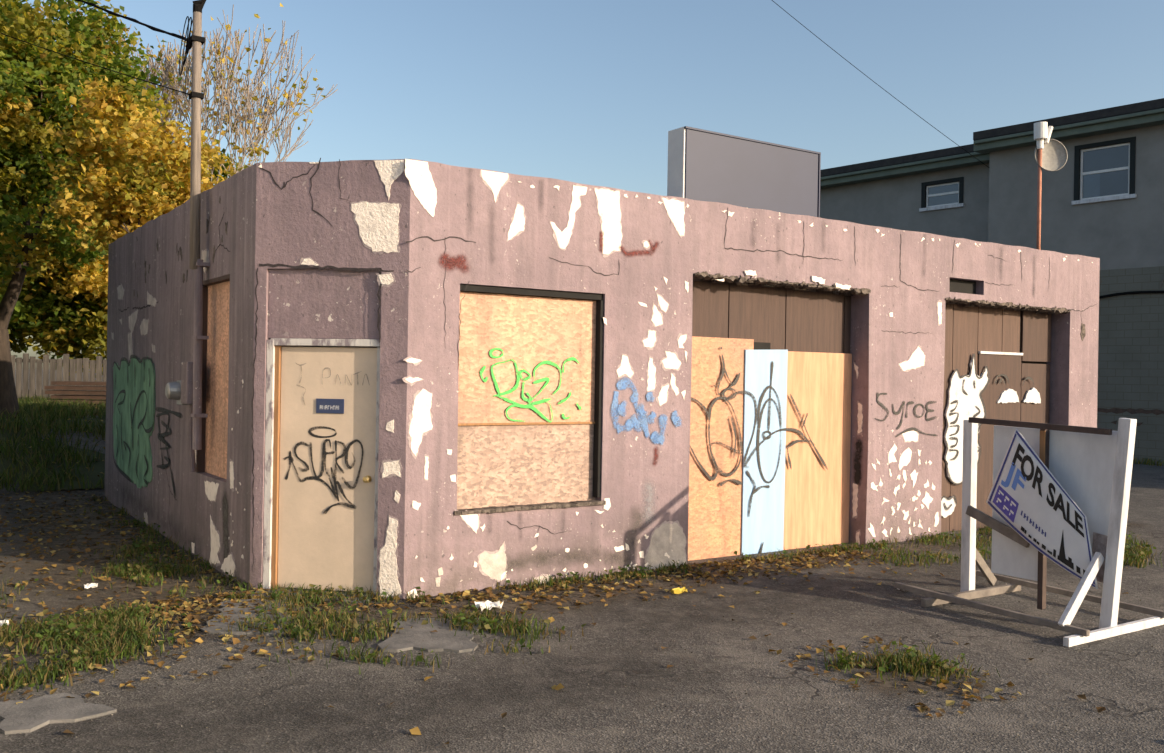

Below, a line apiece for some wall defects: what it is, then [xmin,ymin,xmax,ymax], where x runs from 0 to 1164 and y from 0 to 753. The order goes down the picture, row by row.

crack [260,158,351,227]
peeling [350,159,437,254]
peeling [480,170,535,203]
peeling [506,201,526,242]
peeling [549,184,689,258]
peeling [616,276,687,407]
peeling [380,356,433,481]
peeling [204,459,245,577]
peeling [376,515,454,599]
peeling [473,540,513,582]
peeling [534,520,687,584]
peeling [851,430,939,545]